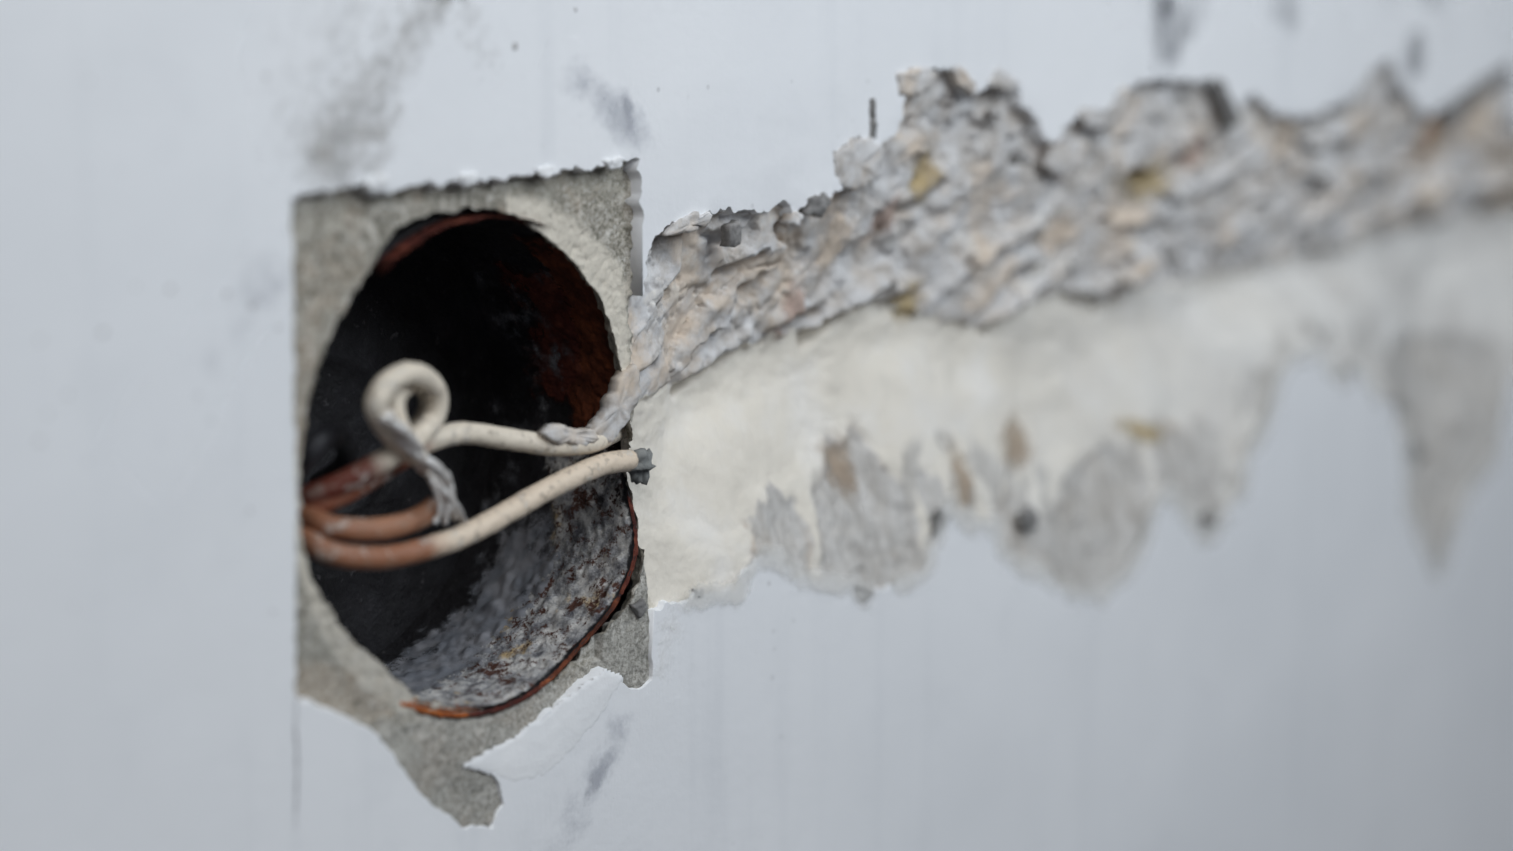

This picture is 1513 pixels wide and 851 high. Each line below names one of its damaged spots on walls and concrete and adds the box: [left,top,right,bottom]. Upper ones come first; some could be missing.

corrosion [373,212,618,429]
flaking render [291,61,1513,828]
corrosion [400,497,638,718]